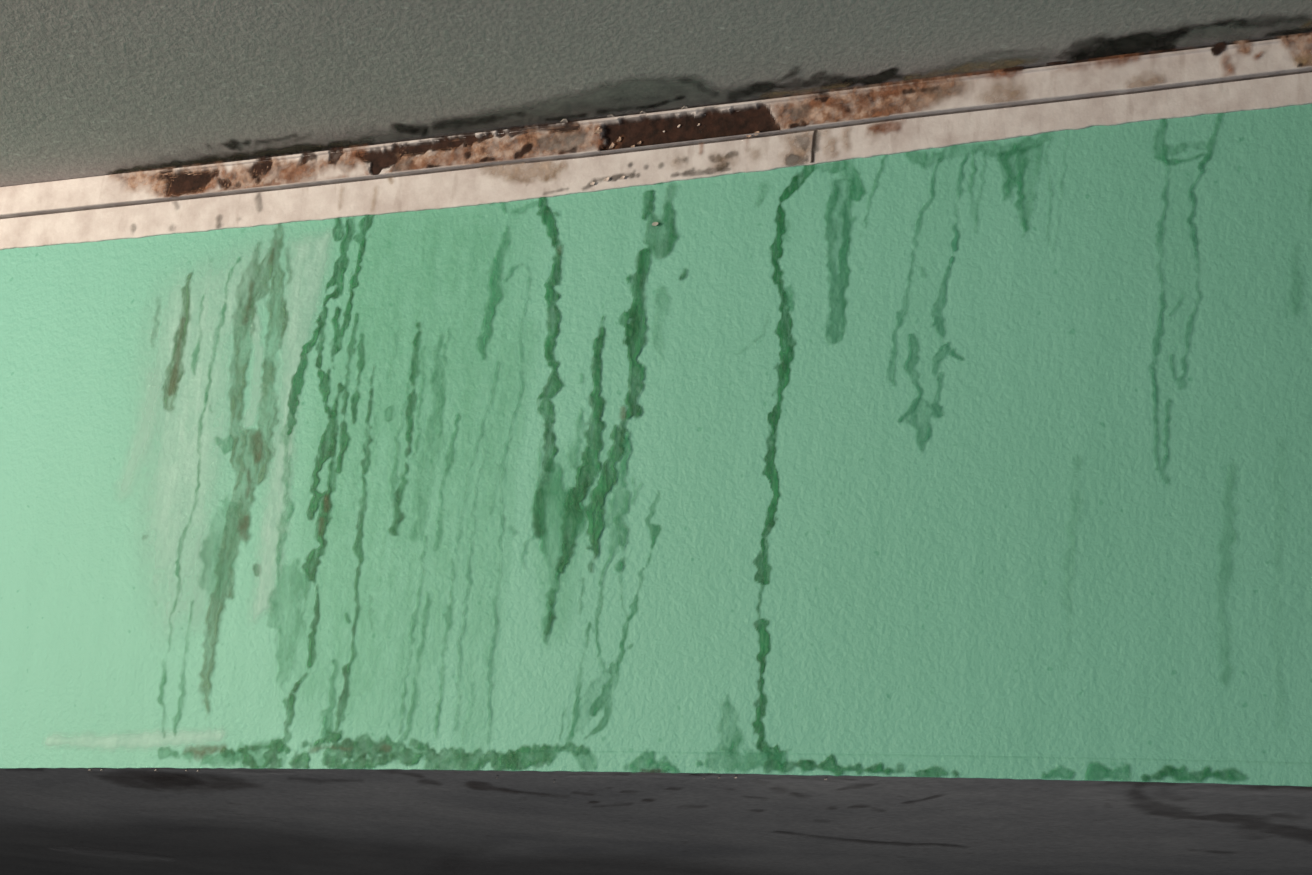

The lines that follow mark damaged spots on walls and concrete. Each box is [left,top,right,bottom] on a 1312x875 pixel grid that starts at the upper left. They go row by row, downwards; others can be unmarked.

damp [950,16,1312,73]
rust [1211,40,1261,73]
rust [1281,33,1312,67]
rust [776,67,1024,129]
rust [121,169,219,196]
damp [112,137,374,174]
rust [390,124,598,172]
damp [537,197,562,471]
damp [755,133,814,584]
damp [557,248,650,573]
damp [156,224,328,711]
damp [752,605,770,749]